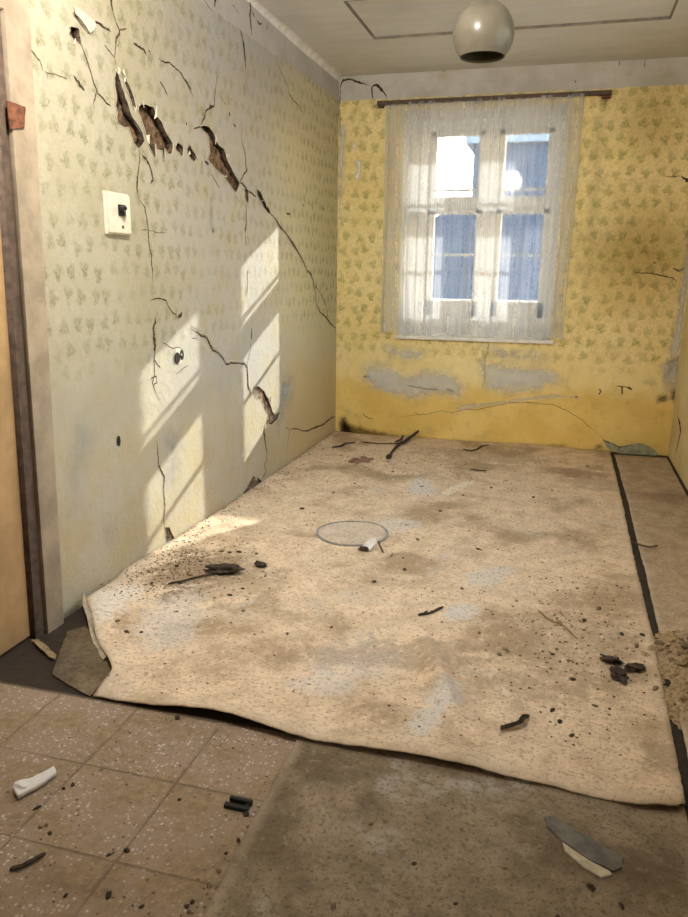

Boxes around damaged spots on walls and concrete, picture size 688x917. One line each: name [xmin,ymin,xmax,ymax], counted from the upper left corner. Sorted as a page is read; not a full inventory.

peeling [69,6,96,47]
crack [32,0,268,238]
spalling [114,67,271,212]
crack [338,76,388,135]
crack [136,150,252,399]
crack [272,214,337,331]
crack [157,446,165,527]
spalling [253,386,280,428]
crack [263,416,336,477]
peeling [366,368,459,395]
crack [398,342,632,438]
peeling [486,366,556,389]